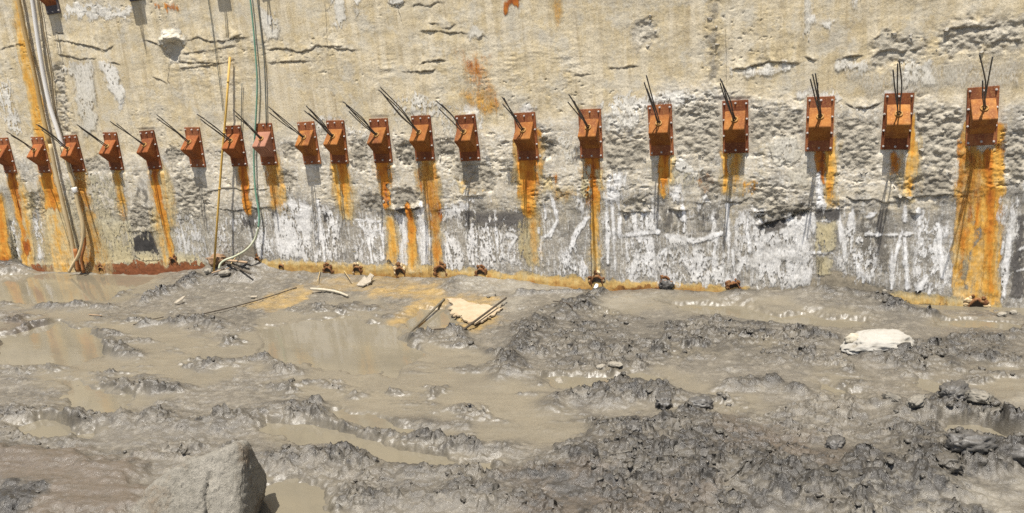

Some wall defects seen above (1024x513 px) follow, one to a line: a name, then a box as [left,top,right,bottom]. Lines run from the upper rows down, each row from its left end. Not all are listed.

rust [0,0,112,274]
rust [148,165,177,268]
rust [237,166,251,215]
rust [330,163,355,220]
rust [376,160,444,275]
damp [11,166,982,306]
rust [512,129,605,277]
rust [657,155,676,198]
rust [815,136,839,209]
rust [890,114,921,202]
rust [950,122,1007,305]
damp [989,196,1024,307]